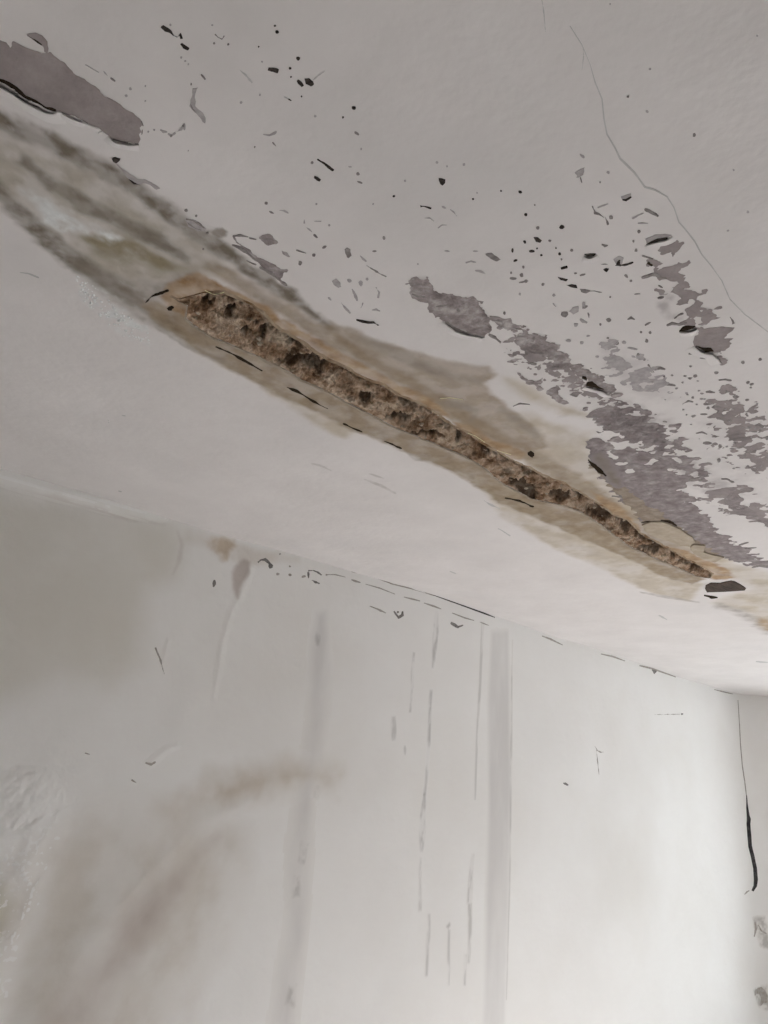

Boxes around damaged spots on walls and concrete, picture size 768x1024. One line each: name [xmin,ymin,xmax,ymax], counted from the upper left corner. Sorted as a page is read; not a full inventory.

peeling [0,33,186,190]
crack [542,1,768,332]
damp [0,103,768,636]
flaking render [145,208,768,599]
crack [601,654,676,677]
crack [714,689,758,895]